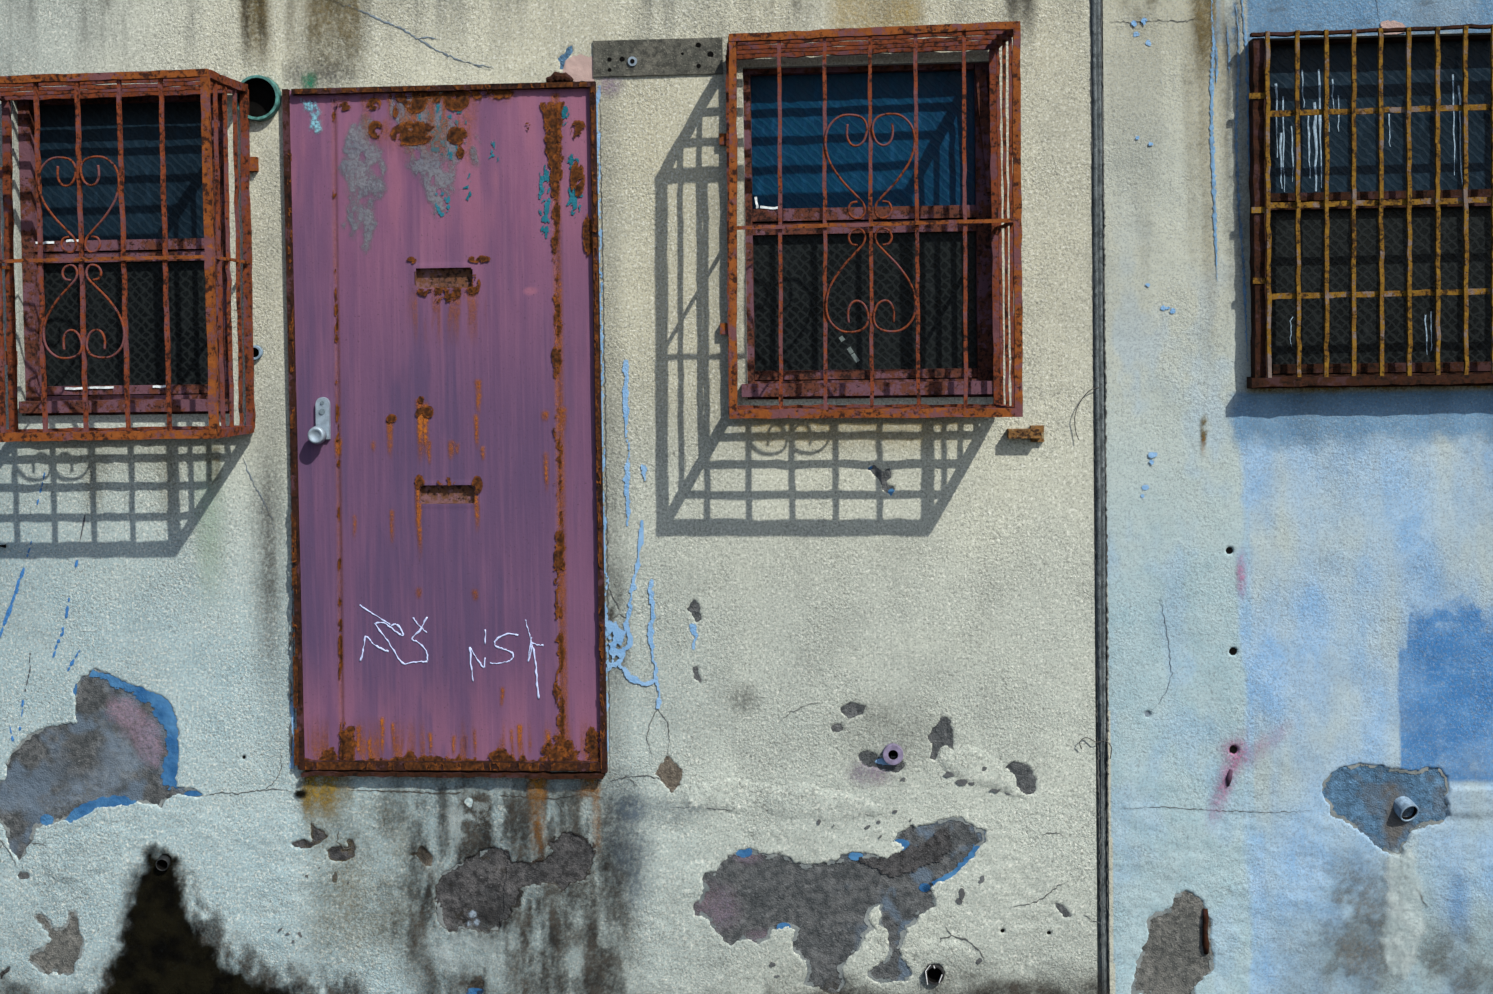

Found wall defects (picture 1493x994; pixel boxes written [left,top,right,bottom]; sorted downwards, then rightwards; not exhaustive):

rust [294,82,605,809]
spalling [27,911,85,976]
spalling [0,668,202,879]
water stain [94,844,361,994]
spalling [411,832,596,934]
water stain [408,778,646,994]
spalling [693,810,986,993]
water stain [962,980,1110,994]
spalling [1131,890,1214,994]
spalling [1322,763,1449,855]